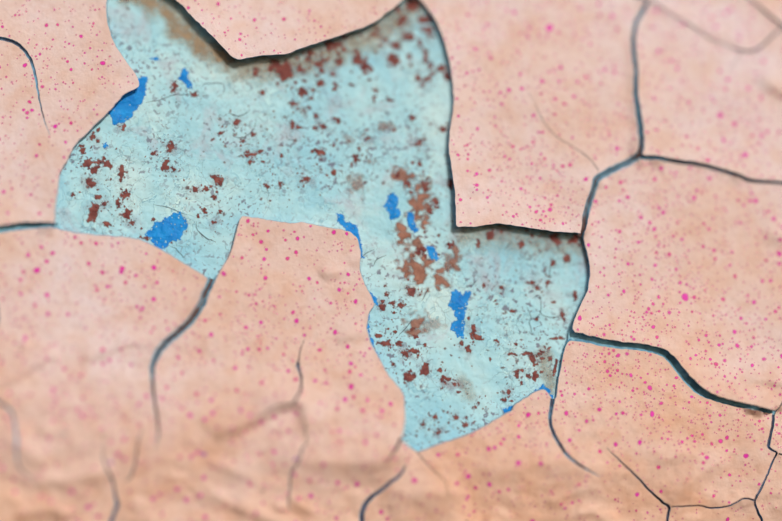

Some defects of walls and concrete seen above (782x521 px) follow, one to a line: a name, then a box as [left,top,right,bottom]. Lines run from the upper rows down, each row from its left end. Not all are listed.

crack [0,38,50,134]
corrosion [71,128,150,241]
crack [102,278,213,521]
corrosion [145,134,232,246]
peeling [55,0,589,463]
corrosion [252,0,451,188]
corrosion [374,114,583,443]
peeling [419,0,782,234]
crack [528,0,782,237]
peeling [551,338,772,463]
crack [568,331,782,521]
peeling [572,158,782,411]